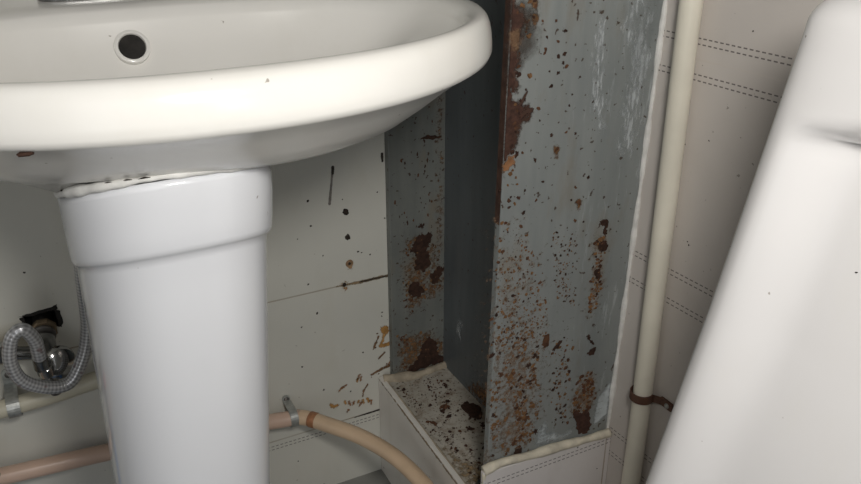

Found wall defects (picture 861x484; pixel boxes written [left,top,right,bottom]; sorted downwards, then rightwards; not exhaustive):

rust [399,151,444,312]
rust [461,0,600,460]
rust [587,219,609,319]
rust [329,325,457,484]